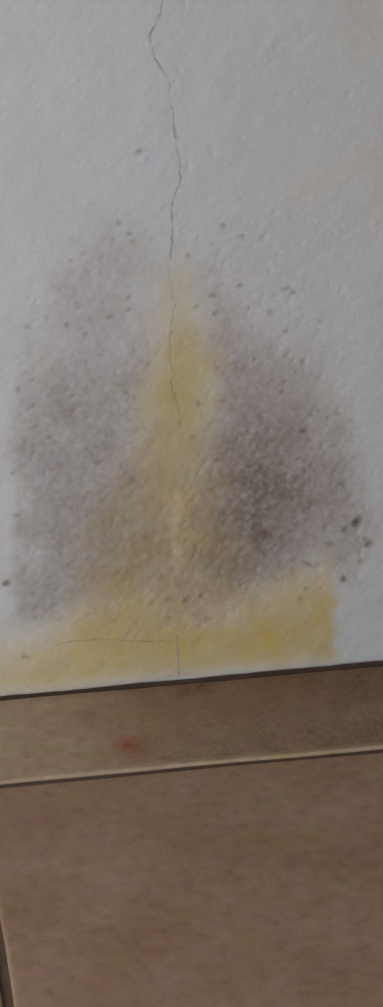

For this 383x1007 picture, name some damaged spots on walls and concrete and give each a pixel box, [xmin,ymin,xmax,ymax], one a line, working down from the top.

water stain [4,286,372,683]